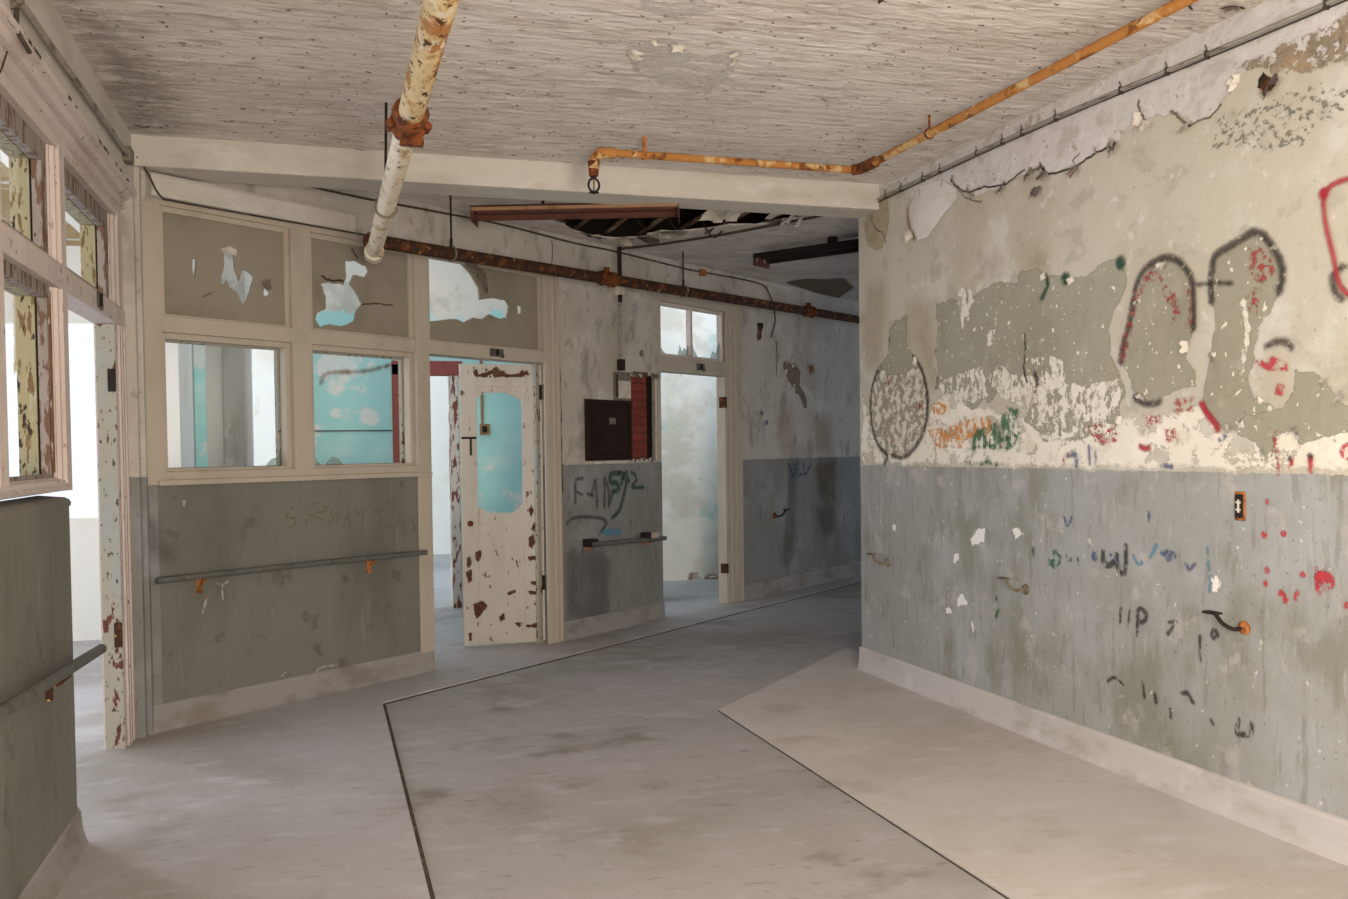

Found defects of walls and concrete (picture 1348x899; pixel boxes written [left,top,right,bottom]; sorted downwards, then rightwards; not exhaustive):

peeling [165,10,315,137]
peeling [429,1,730,167]
peeling [706,4,830,134]
peeling [804,0,1348,250]
peeling [473,367,529,378]
spalling [784,361,807,408]
peeling [861,229,1348,475]
peeling [466,550,482,583]
peeling [473,601,487,618]
peeling [528,506,536,561]